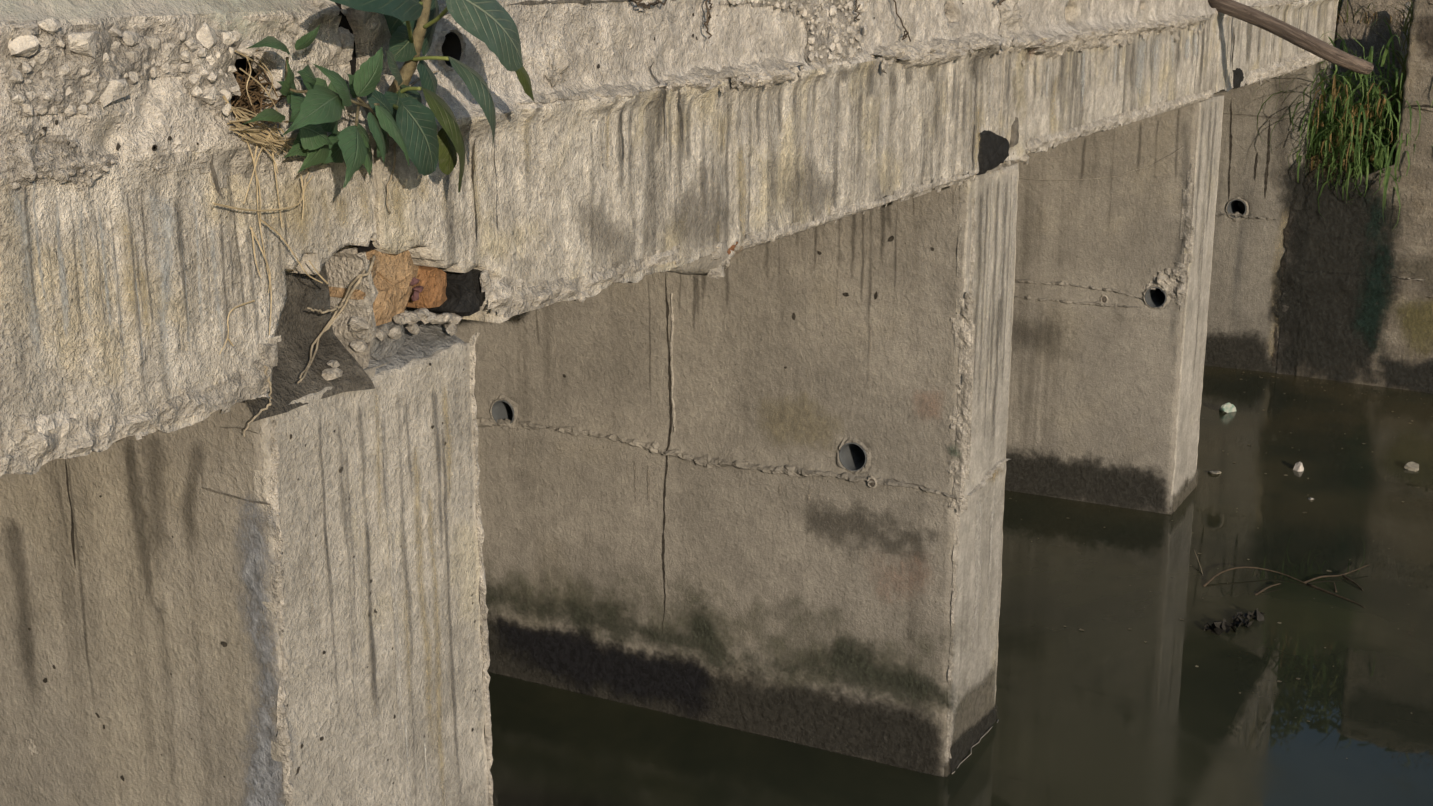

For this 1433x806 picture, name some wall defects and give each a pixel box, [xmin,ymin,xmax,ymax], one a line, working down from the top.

damp [620,110,632,196]
damp [658,87,690,218]
damp [758,75,821,139]
spalling [479,244,681,319]
damp [974,185,1011,418]
damp [1204,164,1433,394]
spalling [0,265,493,806]
crack [661,286,672,642]
damp [479,581,997,778]